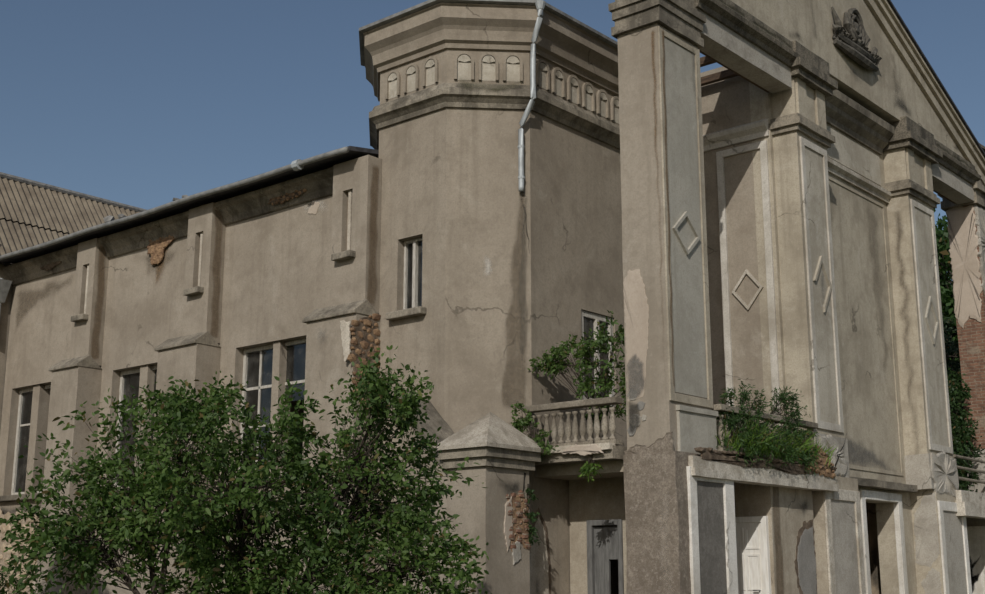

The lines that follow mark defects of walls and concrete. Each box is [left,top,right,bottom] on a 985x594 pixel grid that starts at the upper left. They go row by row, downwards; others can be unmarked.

flaking render [946,205,985,329]
flaking render [340,313,381,416]
flaking render [504,490,531,565]
peeling [794,519,817,594]